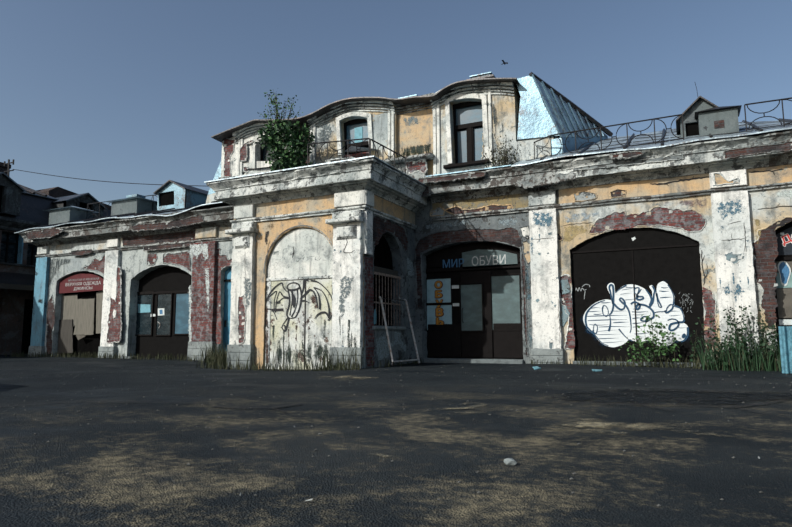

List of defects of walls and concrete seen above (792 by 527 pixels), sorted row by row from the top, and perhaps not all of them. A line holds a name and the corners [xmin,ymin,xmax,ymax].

flaking render [223,138,254,177]
flaking render [610,188,627,199]
flaking render [547,206,707,241]
peeling [717,200,742,220]
flaking render [45,295,55,357]
flaking render [84,250,105,274]
flaking render [106,267,123,344]
flaking render [122,223,232,345]
flaking render [237,277,252,345]
flaking render [702,285,719,356]
flaking render [725,216,792,336]